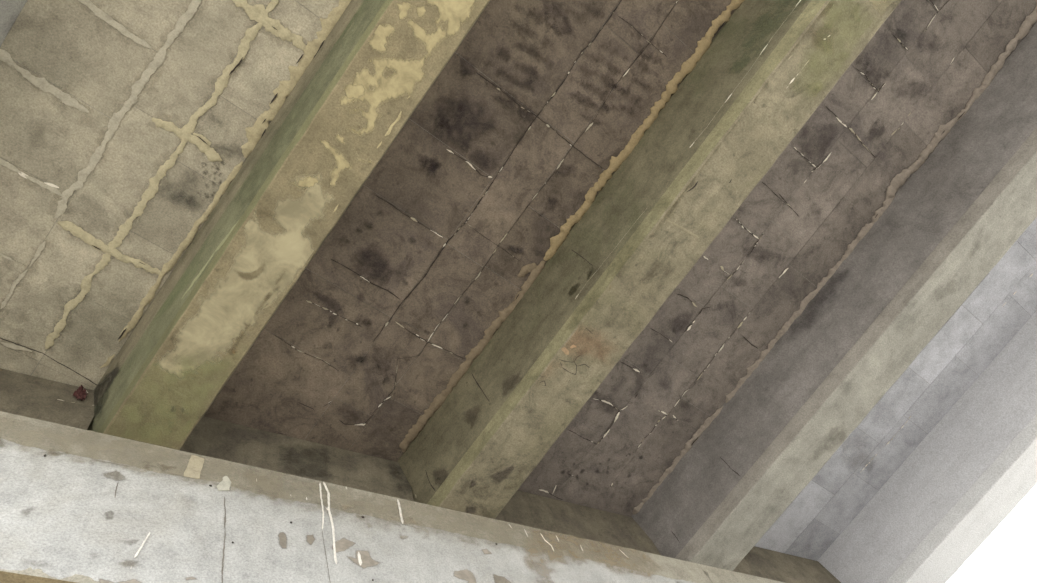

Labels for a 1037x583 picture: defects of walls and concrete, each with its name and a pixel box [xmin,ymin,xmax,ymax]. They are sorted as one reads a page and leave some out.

crack [892,0,949,51]
peeling [298,0,475,187]
crack [826,107,876,158]
crack [793,147,831,183]
crack [298,0,677,426]
water stain [159,173,333,378]
crack [703,219,765,280]
crack [652,294,710,343]
crack [0,338,97,385]
crack [569,361,640,445]
crack [637,313,759,448]
spalling [454,569,476,583]